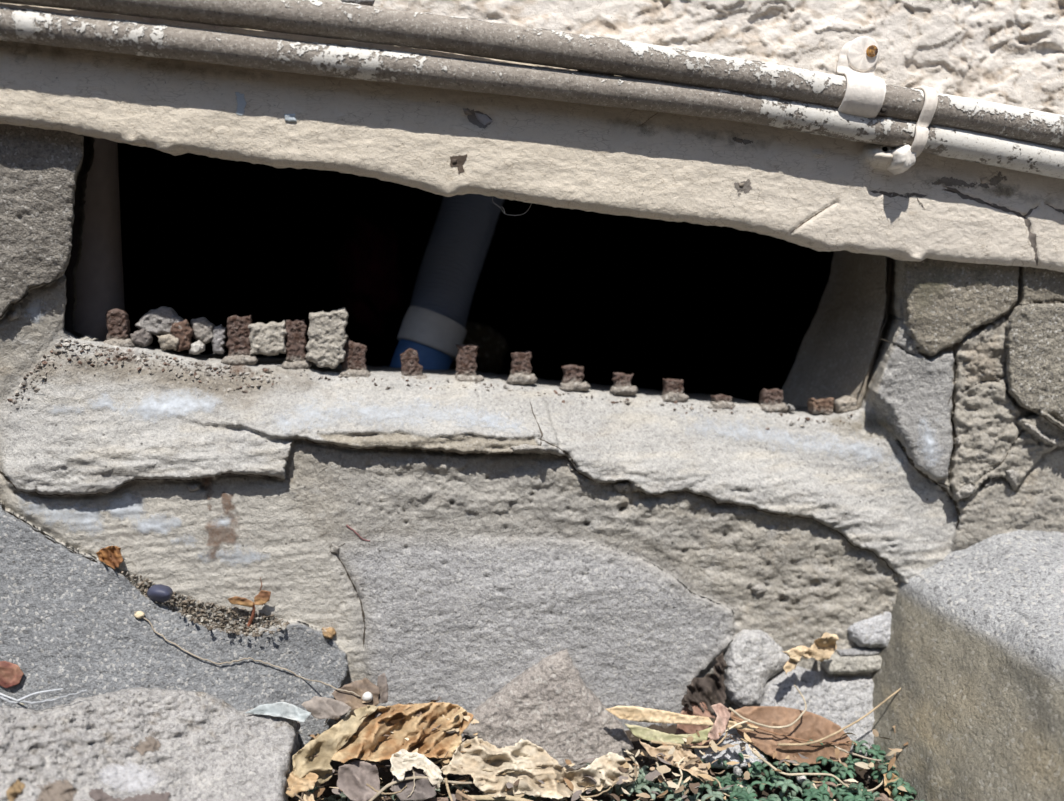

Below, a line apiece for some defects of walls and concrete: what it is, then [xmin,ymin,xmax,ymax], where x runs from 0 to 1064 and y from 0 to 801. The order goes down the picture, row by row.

peeling [0,6,172,58]
peeling [338,2,382,22]
peeling [262,39,465,85]
peeling [414,12,1064,188]
crack [871,185,1064,264]
crack [530,402,577,467]